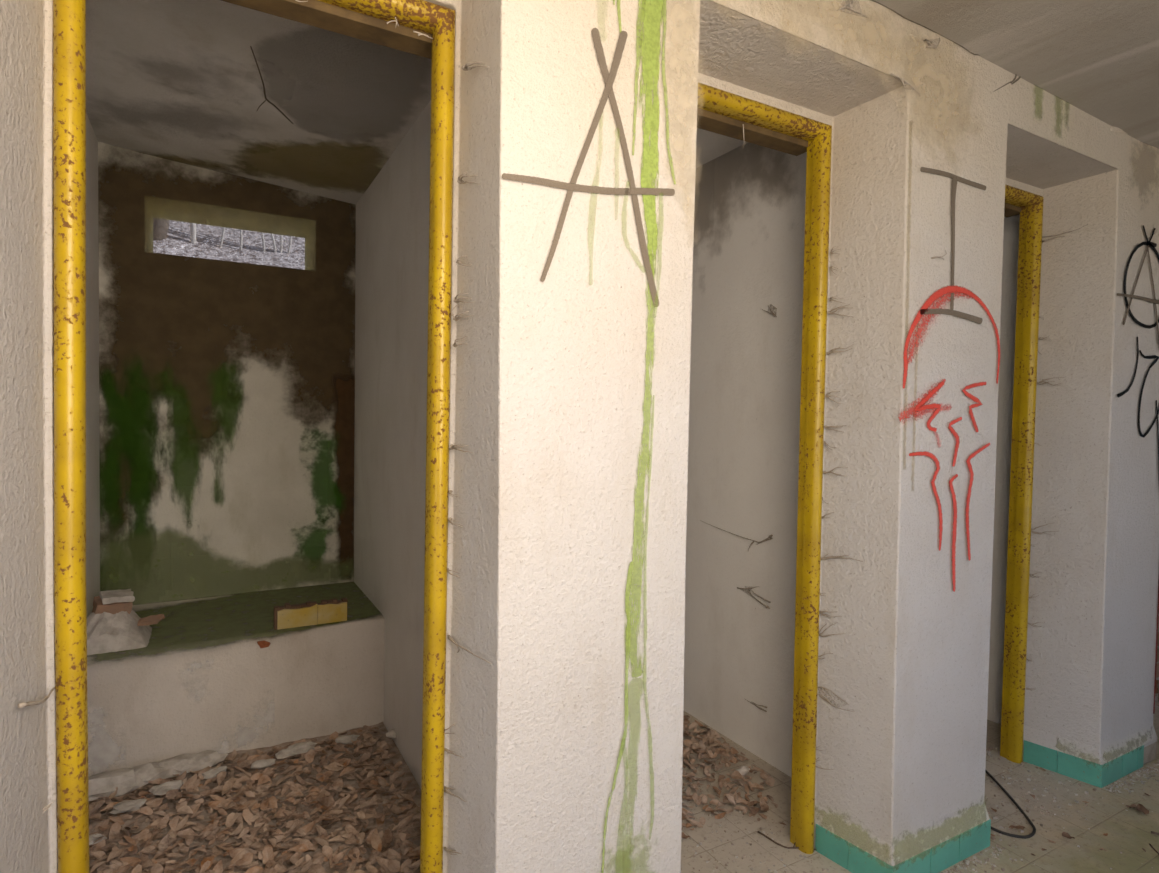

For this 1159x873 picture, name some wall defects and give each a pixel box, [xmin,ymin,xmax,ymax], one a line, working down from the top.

crack [250,46,293,124]
leakage [98,143,383,580]
leakage [602,0,676,873]